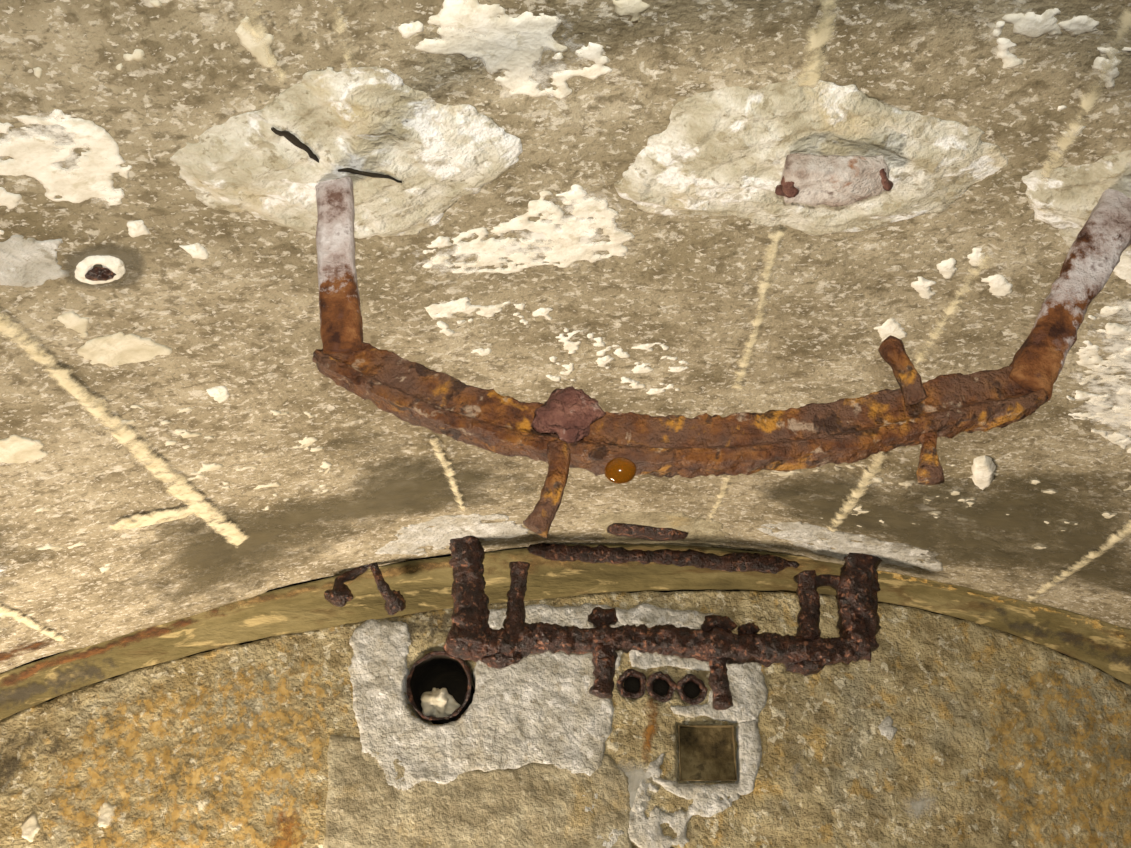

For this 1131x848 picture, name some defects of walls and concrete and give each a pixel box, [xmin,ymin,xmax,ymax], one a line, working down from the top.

peeling [116,49,146,71]
peeling [398,0,612,99]
peeling [0,109,132,209]
peeling [416,184,635,274]
peeling [0,435,48,464]
peeling [35,542,86,552]
corrosion [212,562,451,616]
corrosion [0,620,195,702]